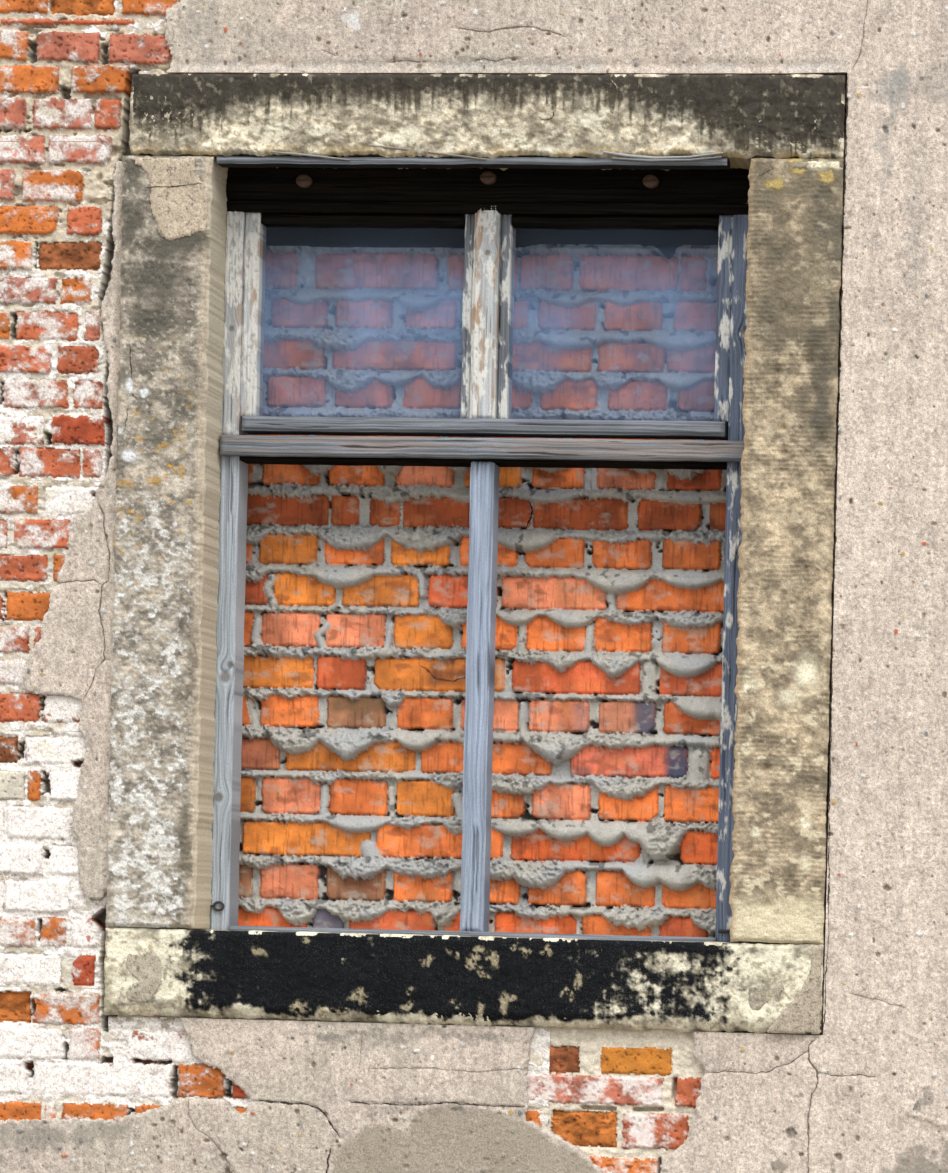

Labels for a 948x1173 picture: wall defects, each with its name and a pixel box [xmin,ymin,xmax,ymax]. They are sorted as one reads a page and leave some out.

peeling [0,5,60,105]
peeling [82,0,185,74]
leakage [401,92,420,110]
leakage [597,90,632,115]
crack [62,502,110,699]
flaking render [0,53,264,1127]
crack [714,0,906,1173]
leakage [106,494,192,928]
leakage [169,930,740,1025]
crack [259,1100,339,1173]
crack [351,1100,525,1108]
spalling [516,1025,726,1173]